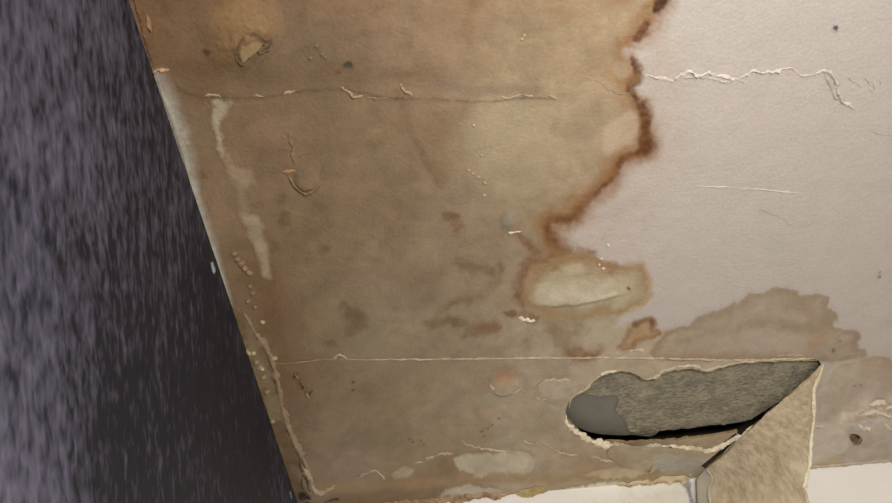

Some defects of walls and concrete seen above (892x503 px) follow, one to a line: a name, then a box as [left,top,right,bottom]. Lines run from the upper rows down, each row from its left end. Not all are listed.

crack [153,68,557,106]
crack [644,67,881,111]
leakage [129,0,740,503]
peeling [244,313,335,497]
spalling [565,402,780,490]
leakage [647,284,892,466]
spalling [810,374,892,469]